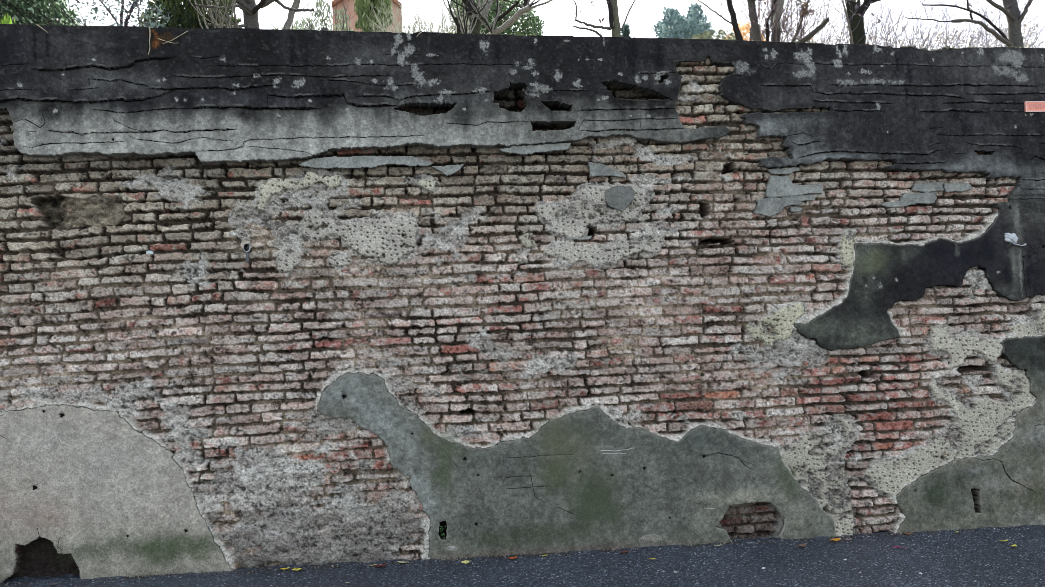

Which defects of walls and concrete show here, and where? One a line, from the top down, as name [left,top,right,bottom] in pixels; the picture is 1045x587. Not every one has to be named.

crack [0,32,525,156]
crack [532,90,684,132]
crack [734,62,1045,200]
spalling [34,195,127,229]
flaking render [301,210,419,265]
flaking render [534,180,647,238]
flaking render [530,232,664,266]
flaking render [743,302,807,347]
flaking render [929,326,1003,371]
flaking render [865,365,1036,496]
flaking render [779,417,857,537]
spalling [6,537,80,580]